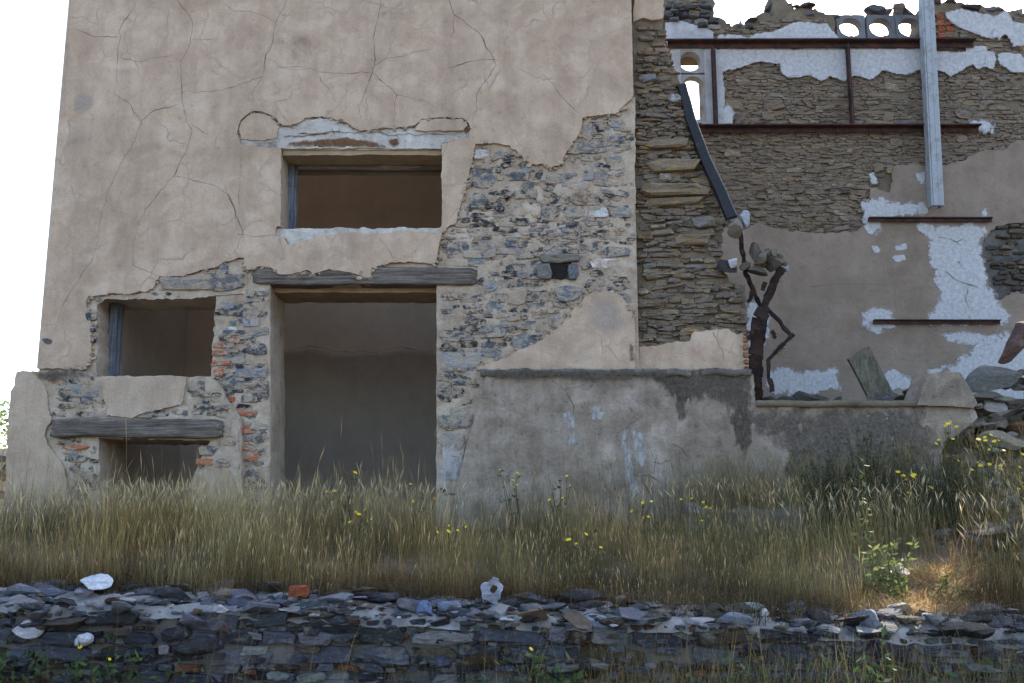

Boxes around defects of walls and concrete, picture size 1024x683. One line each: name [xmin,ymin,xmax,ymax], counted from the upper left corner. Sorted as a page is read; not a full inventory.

peeling [665,21,921,124]
peeling [937,8,1024,76]
crack [58,0,496,318]
peeling [970,119,994,134]
spalling [238,97,637,527]
peeling [746,302,771,347]
peeling [861,197,1024,379]
spalling [36,259,324,525]
leakage [483,369,752,450]
peeling [765,367,841,397]
peeling [884,369,911,391]
peeling [992,388,1024,399]